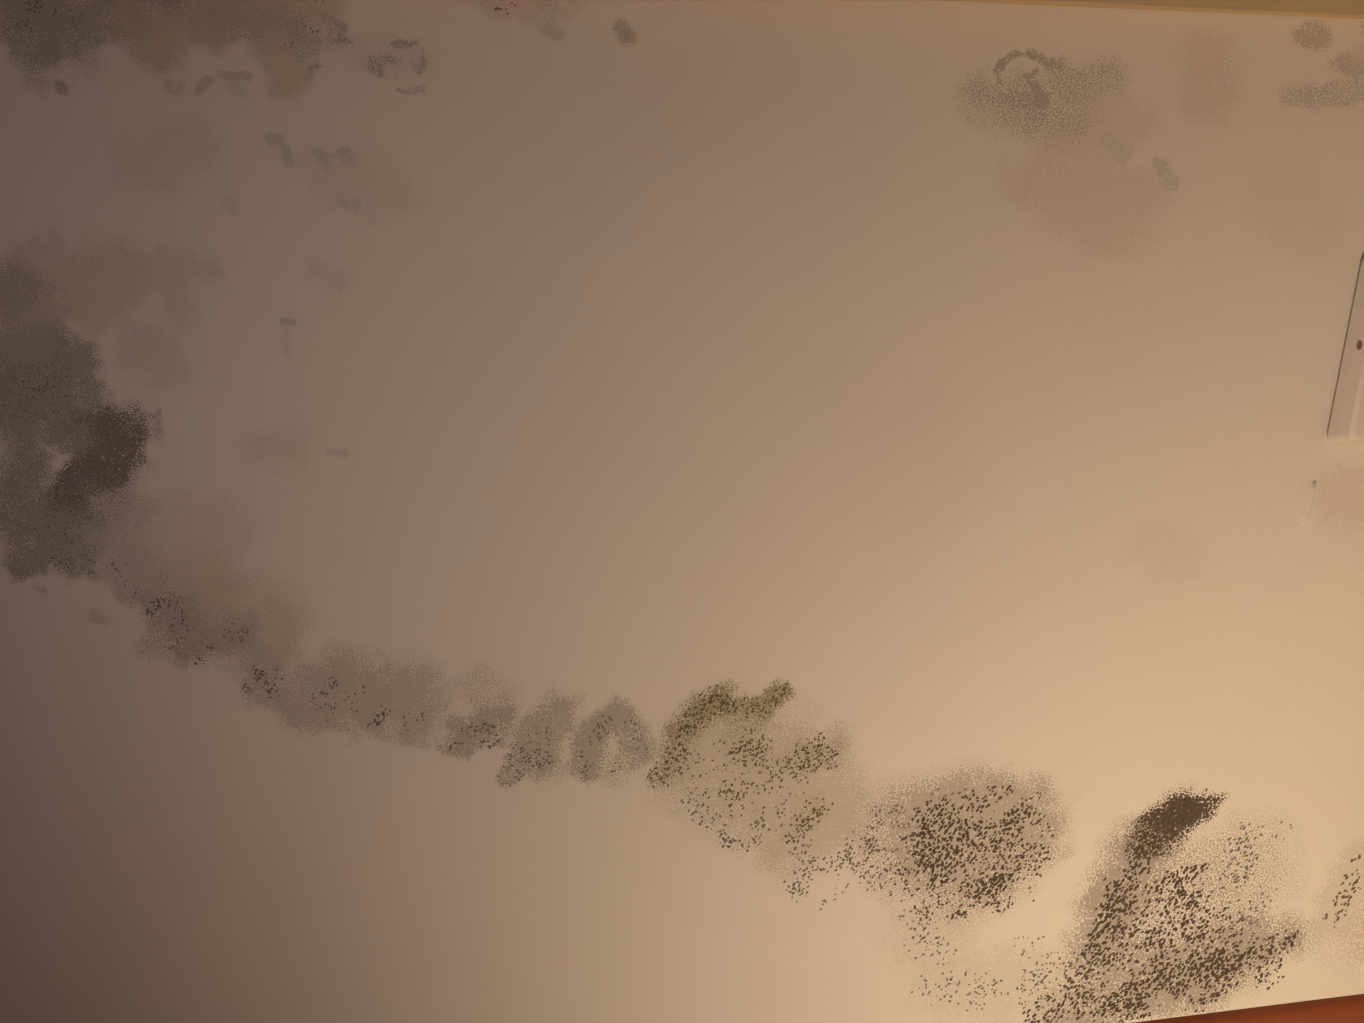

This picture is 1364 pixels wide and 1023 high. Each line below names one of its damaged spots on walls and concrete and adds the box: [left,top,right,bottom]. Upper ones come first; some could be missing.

leakage [0,0,439,105]
leakage [950,47,1136,167]
leakage [1277,19,1364,113]
leakage [0,223,1364,1023]